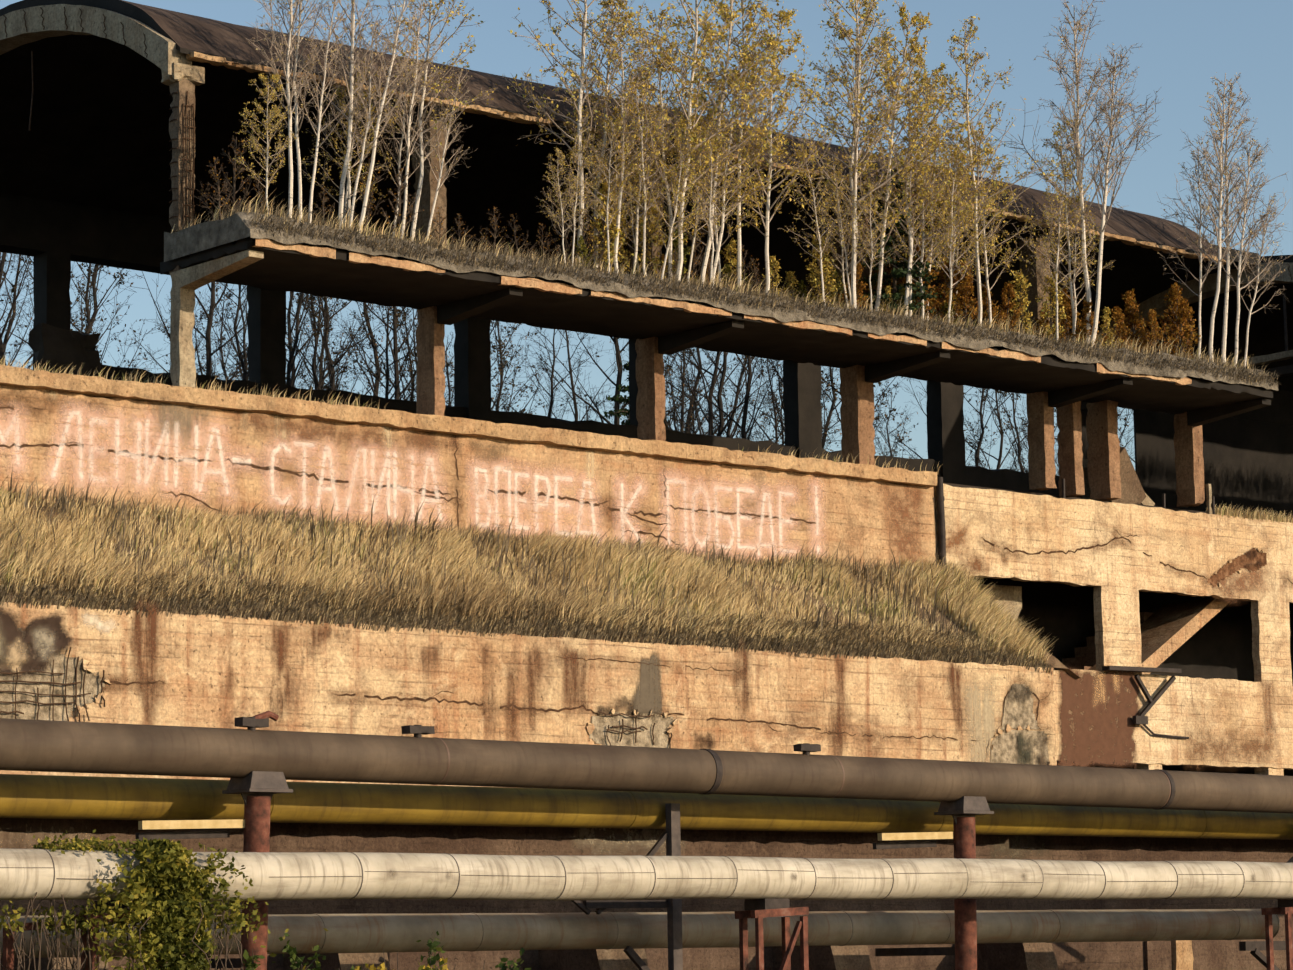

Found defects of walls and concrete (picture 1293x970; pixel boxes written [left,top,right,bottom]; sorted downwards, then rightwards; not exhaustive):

crack [0,435,819,545]
crack [983,529,1205,577]
spalling [1207,547,1267,587]
spalling [0,607,111,722]
corrosion [133,603,157,721]
corrosion [274,629,290,717]
crack [335,691,598,714]
corrosion [507,652,540,737]
corrosion [564,649,584,709]
spalling [585,708,677,748]
spalling [990,684,1053,765]